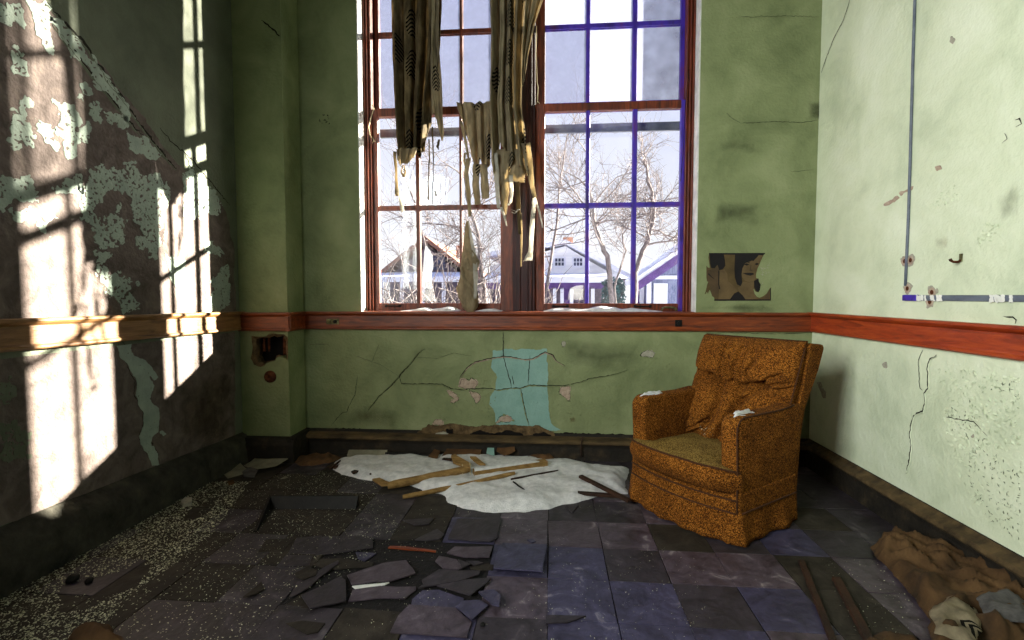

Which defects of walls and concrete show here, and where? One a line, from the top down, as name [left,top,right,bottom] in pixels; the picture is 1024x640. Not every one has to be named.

peeling [0,0,237,319]
peeling [0,332,236,526]
spalling [251,334,288,367]
crack [333,334,624,430]
spalling [417,414,555,436]
crack [906,350,986,474]